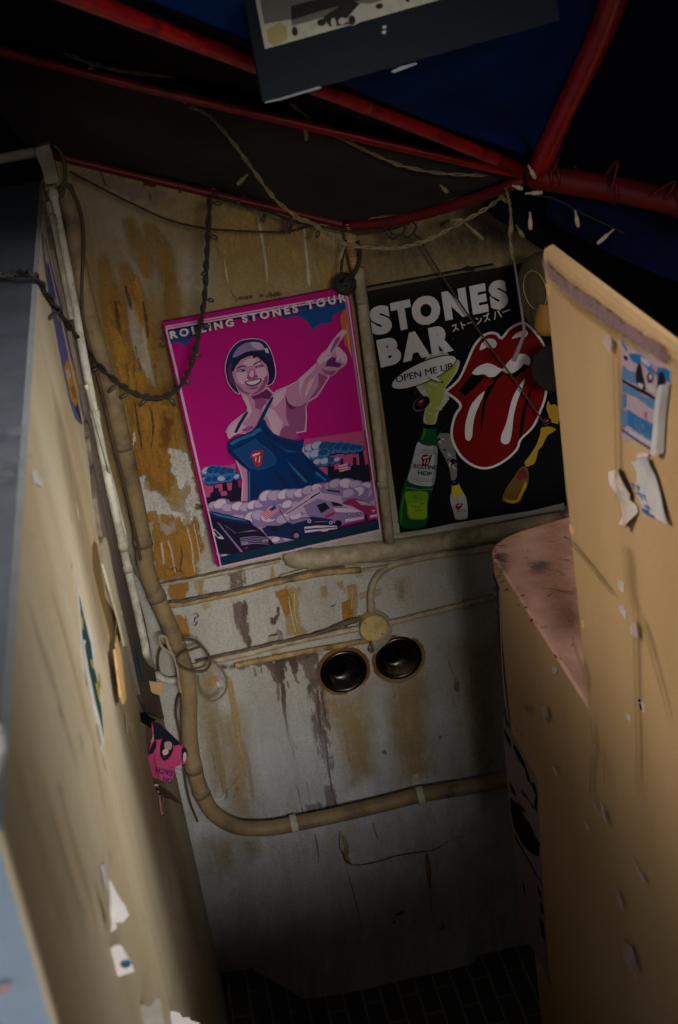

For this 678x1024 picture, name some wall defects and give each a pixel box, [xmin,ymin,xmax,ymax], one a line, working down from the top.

peeling [139,448,207,538]
corrosion [276,587,305,635]
corrosion [321,582,358,620]
crack [339,831,476,928]